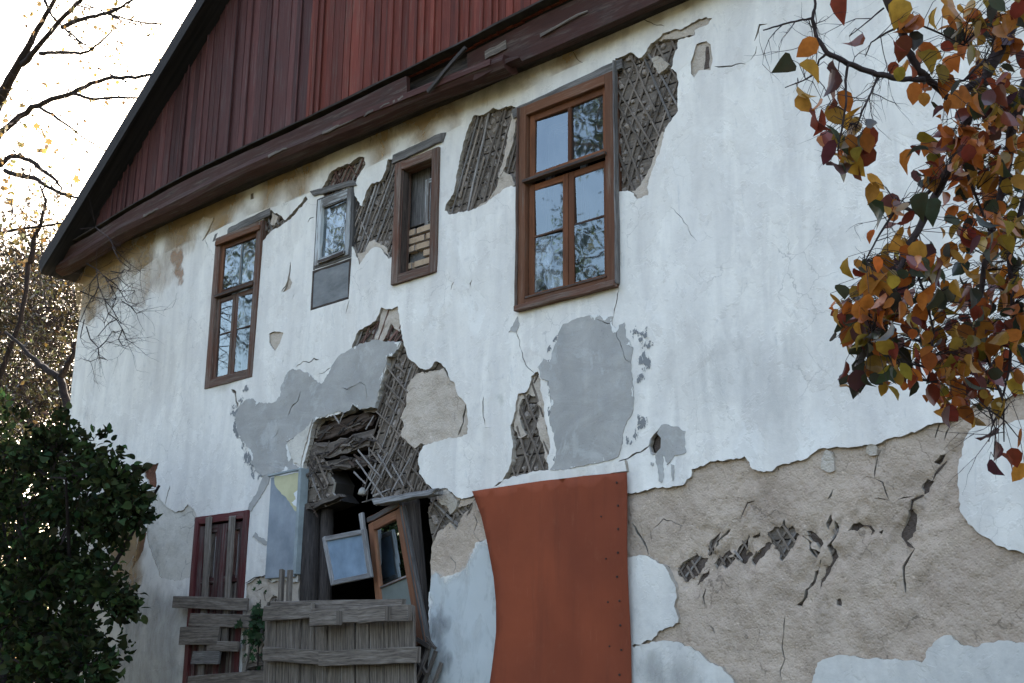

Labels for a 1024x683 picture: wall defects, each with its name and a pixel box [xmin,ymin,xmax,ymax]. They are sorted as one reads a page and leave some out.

spalling [326,158,365,196]
spalling [354,162,395,263]
spalling [449,107,517,214]
spalling [618,18,711,199]
spalling [508,335,558,479]
peeling [590,314,653,397]
spalling [282,308,496,683]
spalling [626,394,1024,683]
crack [870,461,947,511]
crack [903,539,915,583]